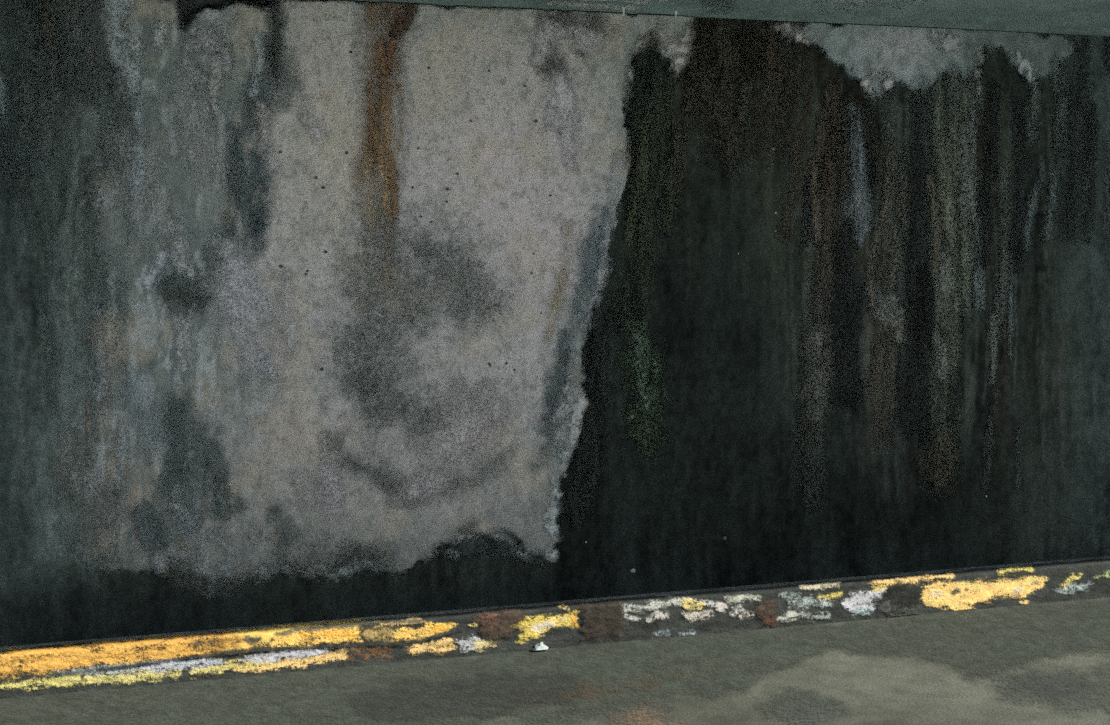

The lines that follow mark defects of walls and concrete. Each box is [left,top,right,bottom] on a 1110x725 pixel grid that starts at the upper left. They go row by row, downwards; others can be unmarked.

damp [0,0,324,386]
corrosion [352,2,407,285]
damp [294,205,517,525]
damp [532,206,620,527]
damp [531,0,662,172]
damp [794,35,1110,513]
damp [120,377,248,563]
peeling [0,616,497,690]
peeling [512,604,580,644]
peeling [623,595,761,636]
peeling [775,567,1047,622]
peeling [1057,571,1109,594]